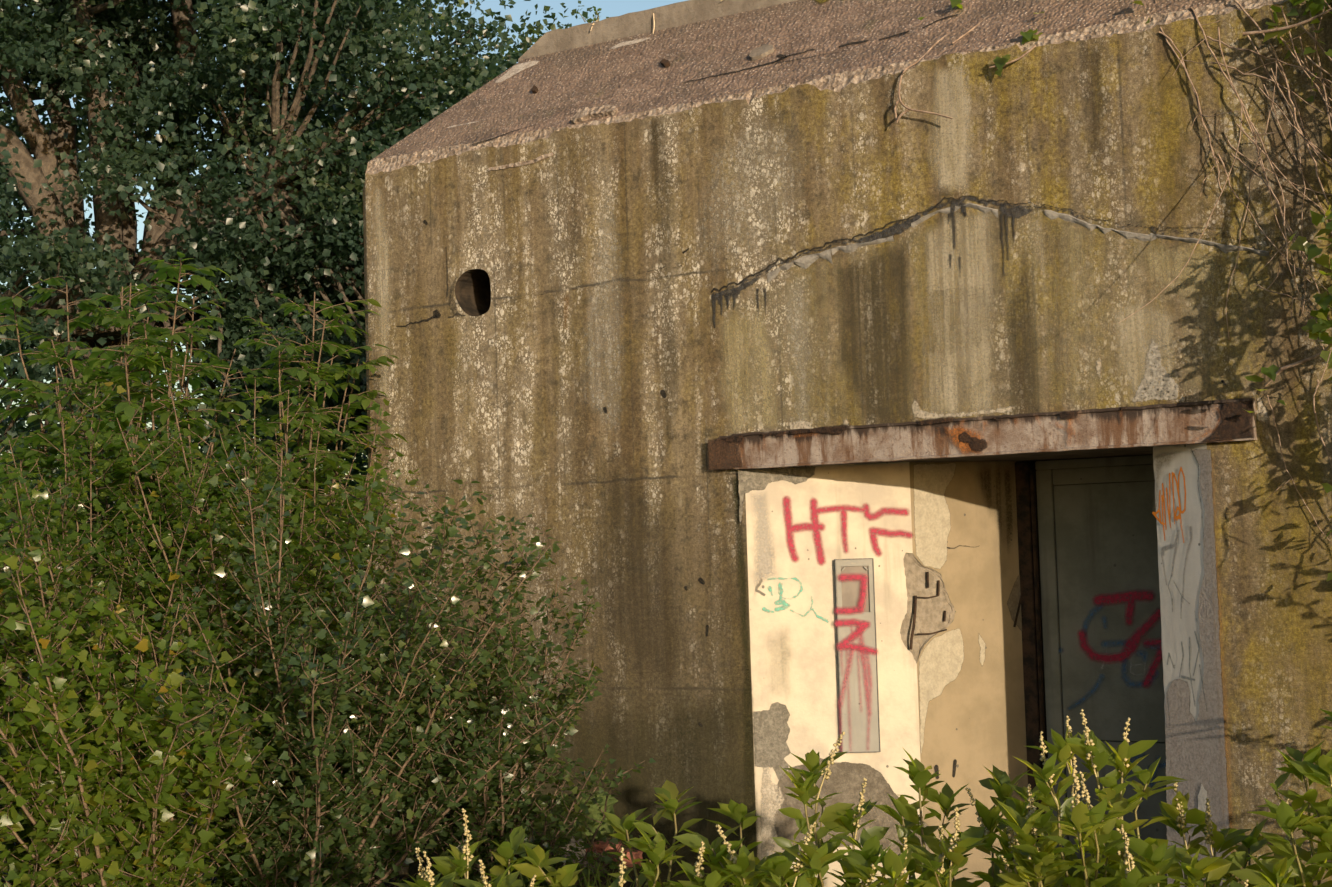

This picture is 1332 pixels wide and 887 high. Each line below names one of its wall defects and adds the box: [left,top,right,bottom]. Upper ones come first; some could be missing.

water stain [936,68,968,187]
water stain [378,191,388,395]
water stain [927,217,990,413]
crack [711,196,1270,328]
corrosion [761,424,849,438]
corrosion [916,417,987,453]
corrosion [1056,411,1079,443]
corrosion [1202,400,1254,442]
water stain [738,499,771,859]
spalling [900,463,986,754]
peeling [1165,449,1231,887]
peeling [753,702,929,860]